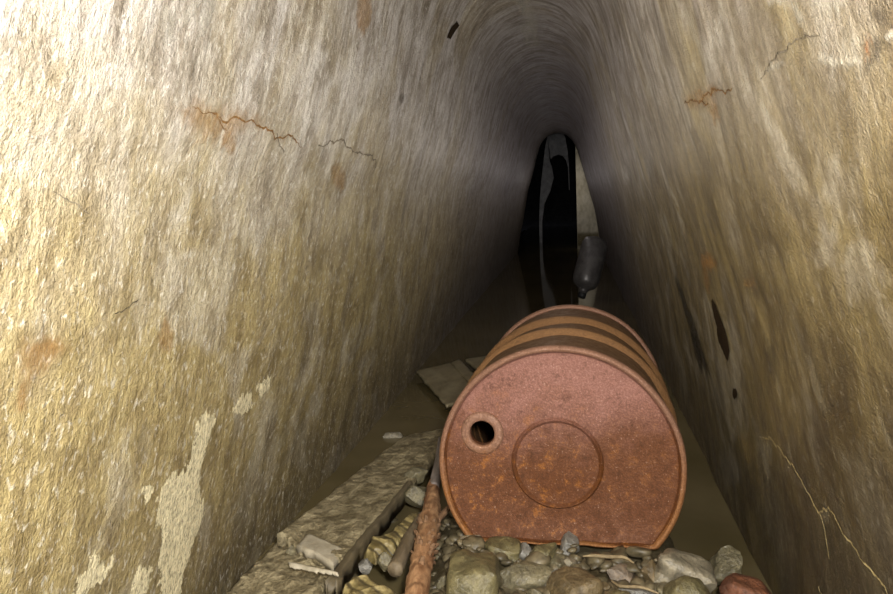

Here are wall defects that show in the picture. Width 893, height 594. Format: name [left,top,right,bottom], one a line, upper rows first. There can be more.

crack [684,88,732,106]
crack [192,106,376,167]
spalling [711,299,730,360]
peeling [230,375,271,417]
peeling [131,411,216,594]
crack [759,436,888,594]
peeling [72,551,114,594]